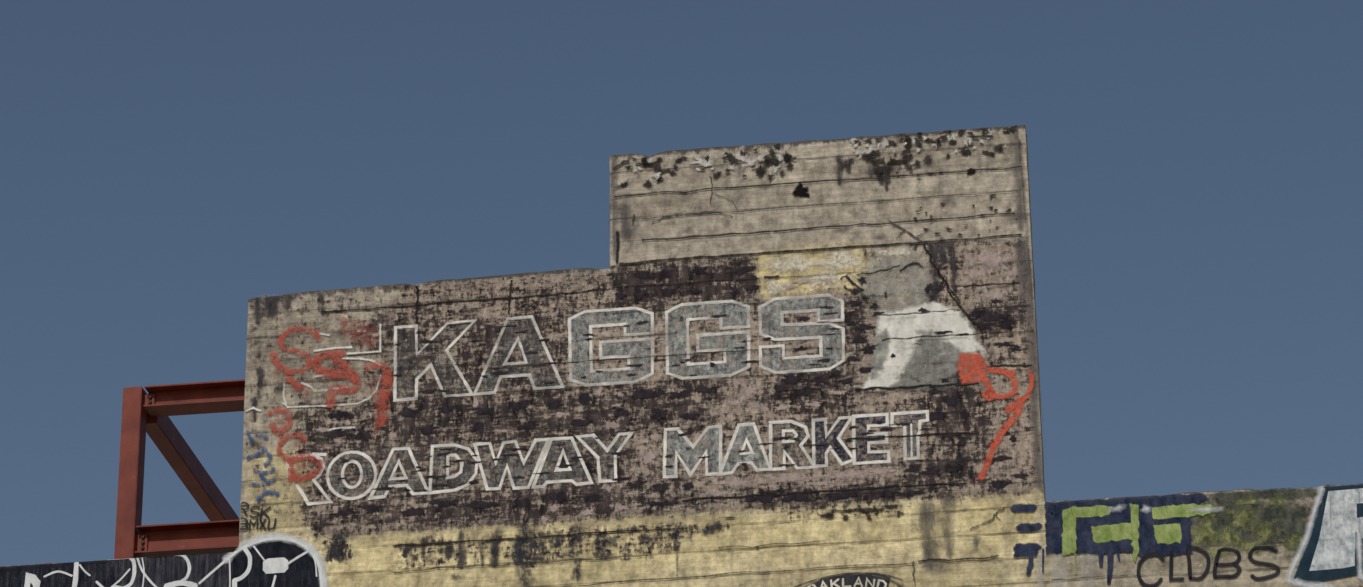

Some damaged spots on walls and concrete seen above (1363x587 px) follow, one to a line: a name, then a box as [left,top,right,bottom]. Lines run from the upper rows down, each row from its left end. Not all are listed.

spalling [612,143,796,188]
spalling [841,125,1018,181]
spalling [793,183,810,197]
crack [321,166,1034,341]
crack [489,349,758,369]
crack [855,364,1032,391]
water stain [404,526,617,585]